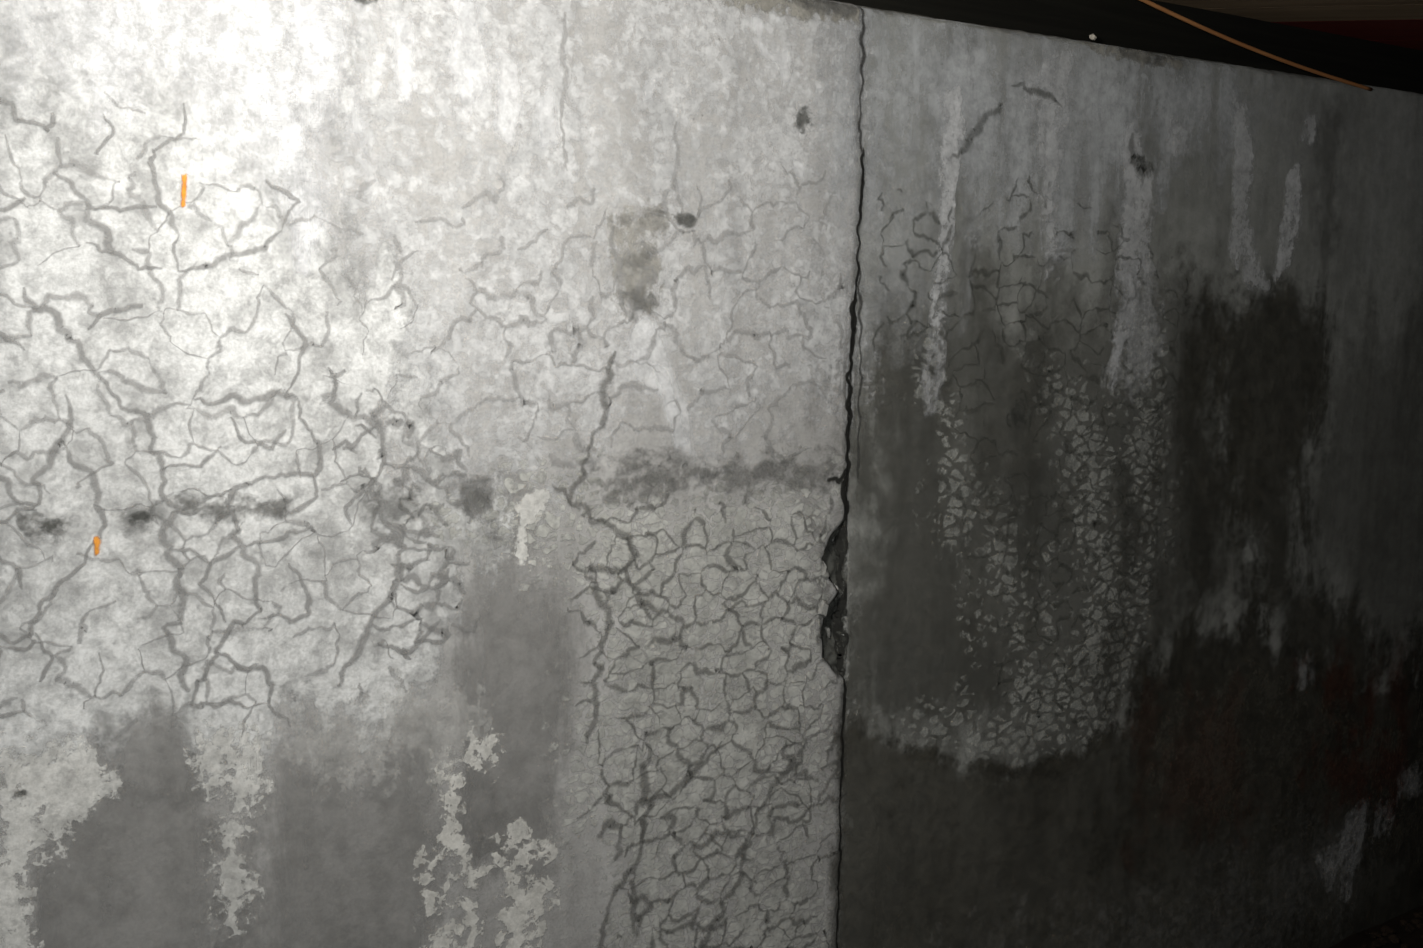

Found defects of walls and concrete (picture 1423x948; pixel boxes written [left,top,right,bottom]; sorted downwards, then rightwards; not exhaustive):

crack [0,332,25,350]
crack [3,197,25,211]
crack [11,103,55,132]
crack [0,407,107,682]
crack [57,103,300,270]
crack [23,292,489,717]
water stain [0,0,868,948]
crack [827,7,866,948]
water stain [562,5,1423,948]
crack [0,711,16,719]